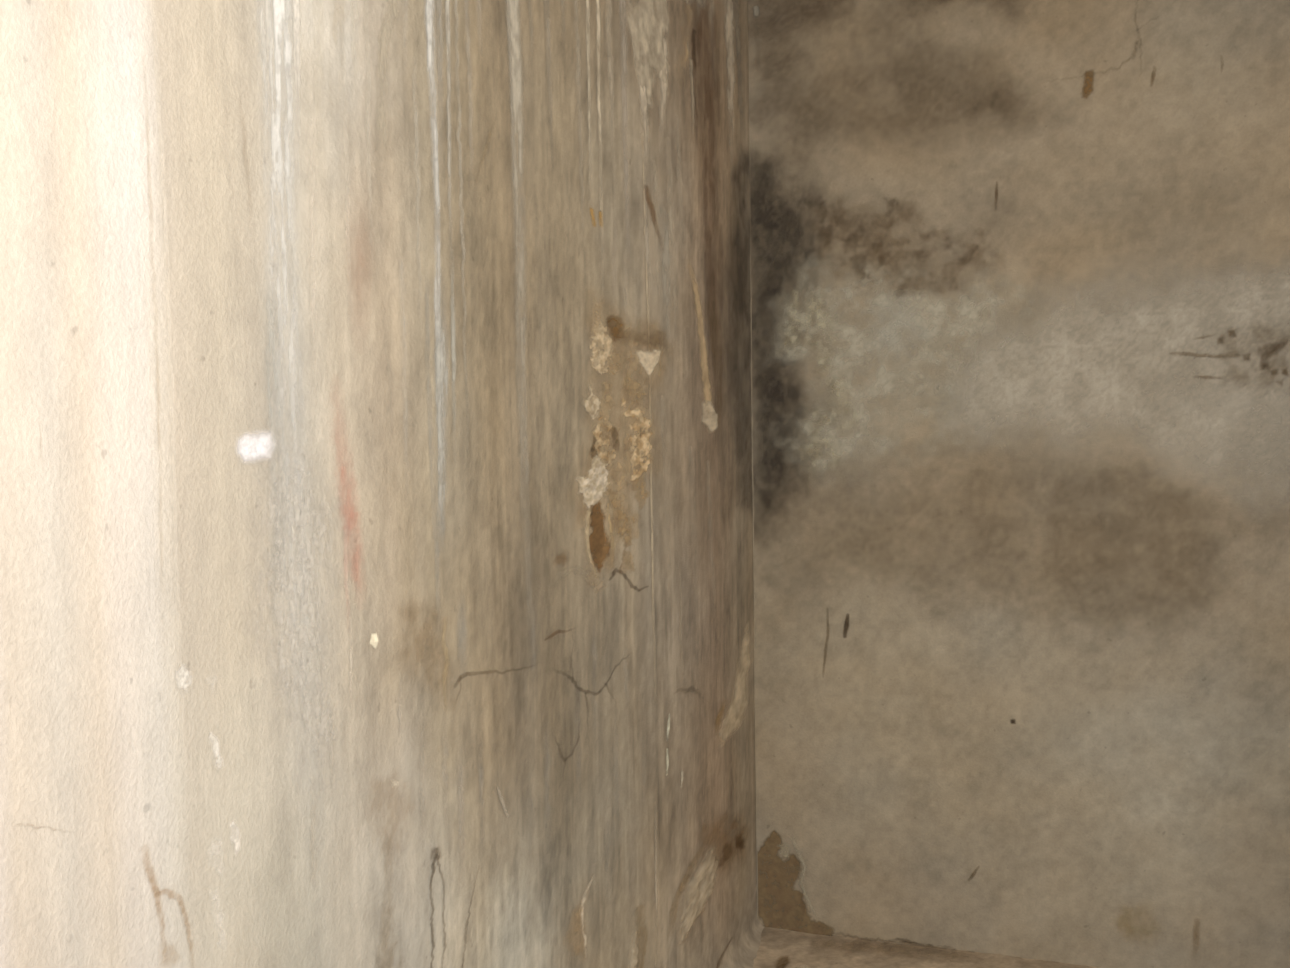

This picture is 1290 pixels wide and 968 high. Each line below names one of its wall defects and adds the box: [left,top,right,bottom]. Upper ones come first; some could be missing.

leakage [260,0,300,206]
leakage [426,0,451,209]
leakage [508,0,524,298]
leakage [578,0,657,353]
leakage [725,0,740,124]
leakage [435,244,456,511]
peeling [578,311,663,591]
leakage [736,162,1290,511]
flaking render [757,831,833,936]